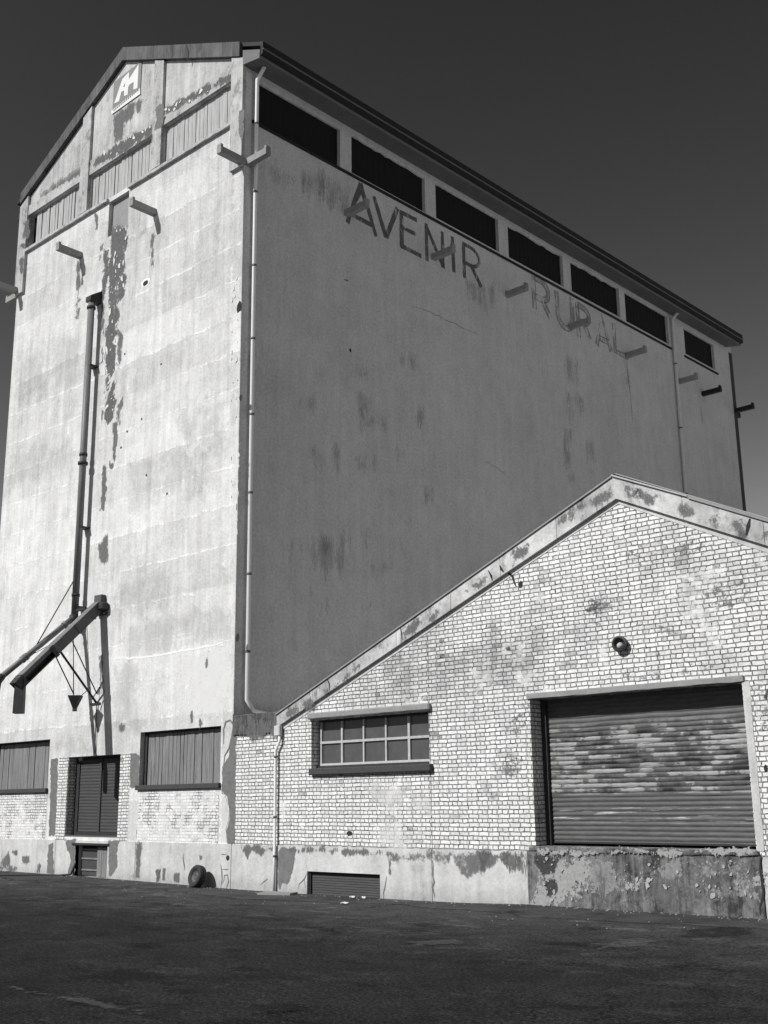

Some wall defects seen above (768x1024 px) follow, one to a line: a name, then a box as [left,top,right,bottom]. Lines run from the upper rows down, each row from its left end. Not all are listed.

peeling [93,74,231,168]
peeling [99,225,128,511]
peeling [98,533,109,562]
water stain [289,845,525,878]
peeling [529,846,768,906]